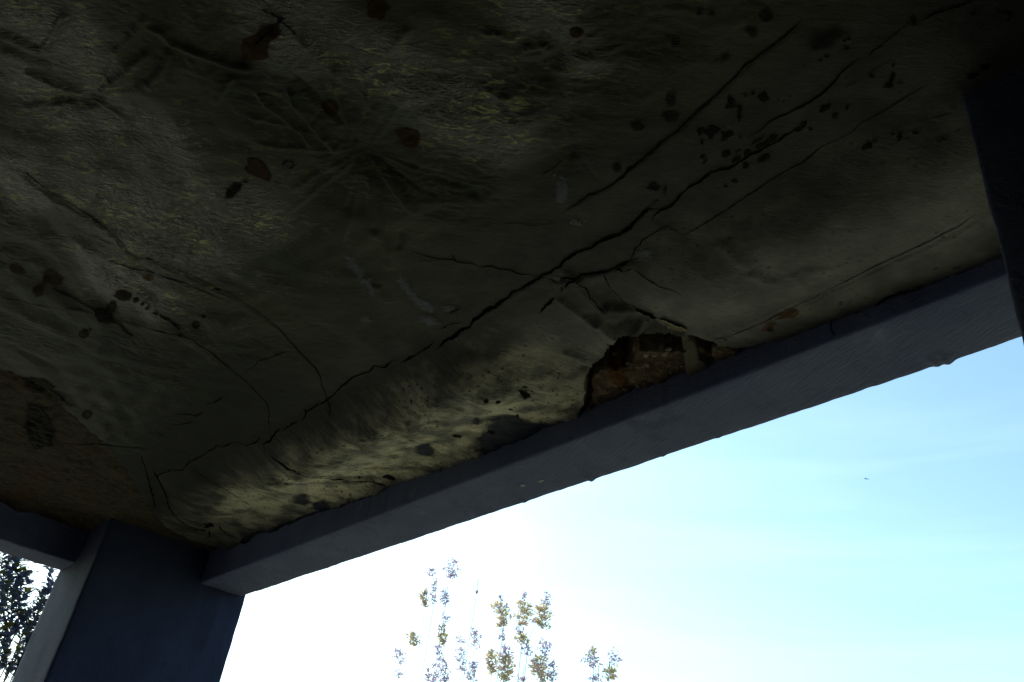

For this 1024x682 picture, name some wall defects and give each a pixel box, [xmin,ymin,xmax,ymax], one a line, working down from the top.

crack [2,0,980,544]
spalling [583,319,741,411]
damp [416,444,434,456]
damp [472,415,563,455]